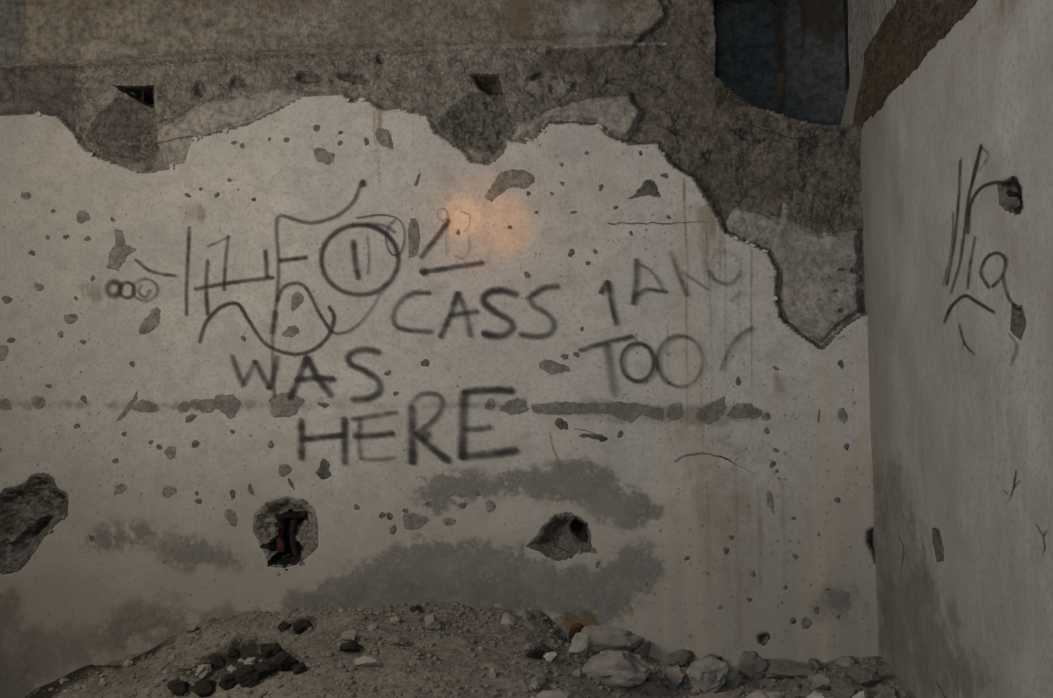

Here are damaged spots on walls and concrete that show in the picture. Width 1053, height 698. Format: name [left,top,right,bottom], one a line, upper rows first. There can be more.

spalling [0,0,977,350]
spalling [997,176,1024,214]
spalling [0,337,16,361]
spalling [0,472,69,575]
spalling [224,490,237,527]
spalling [253,464,318,571]
leakage [418,460,663,528]
spalling [526,512,600,568]
leakage [284,535,663,624]